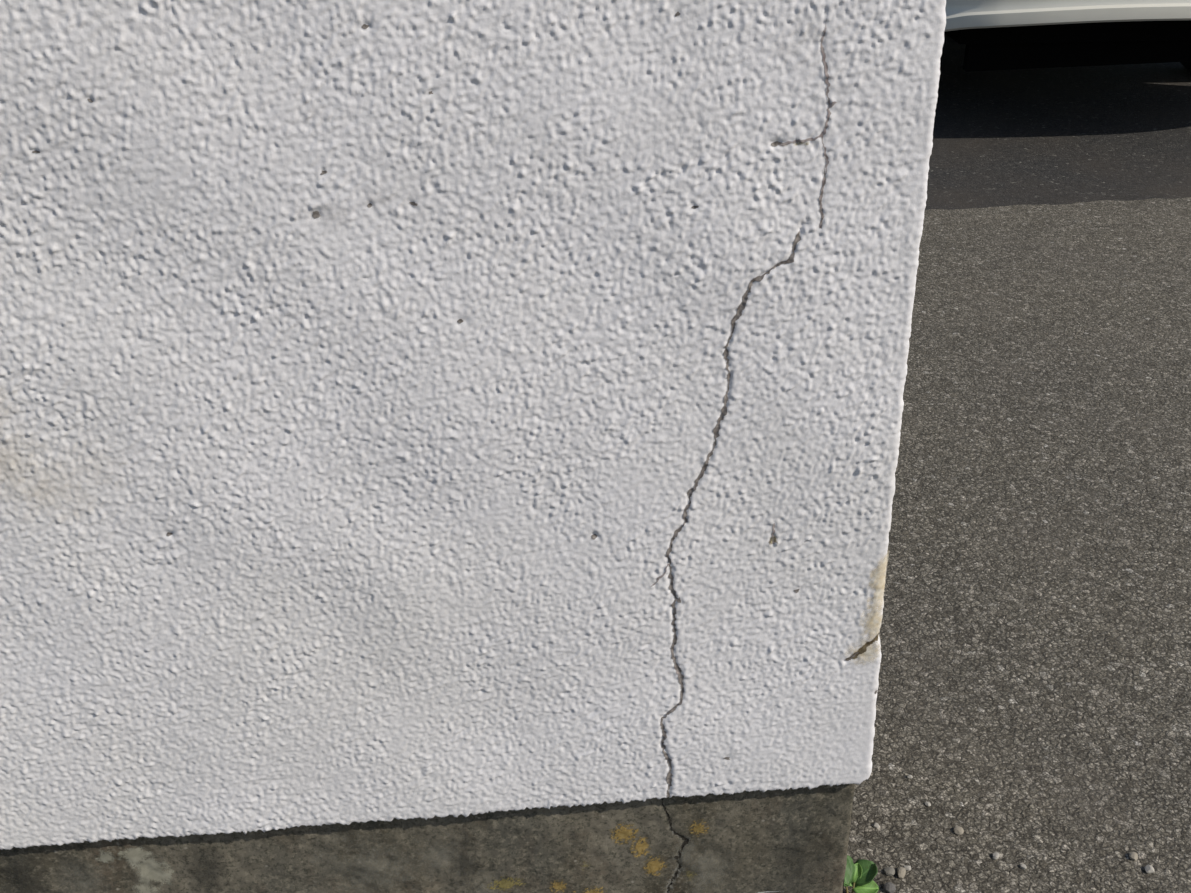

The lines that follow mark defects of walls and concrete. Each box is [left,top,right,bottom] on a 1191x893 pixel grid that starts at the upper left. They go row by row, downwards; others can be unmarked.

crack [653,27,836,893]
crack [846,633,879,661]